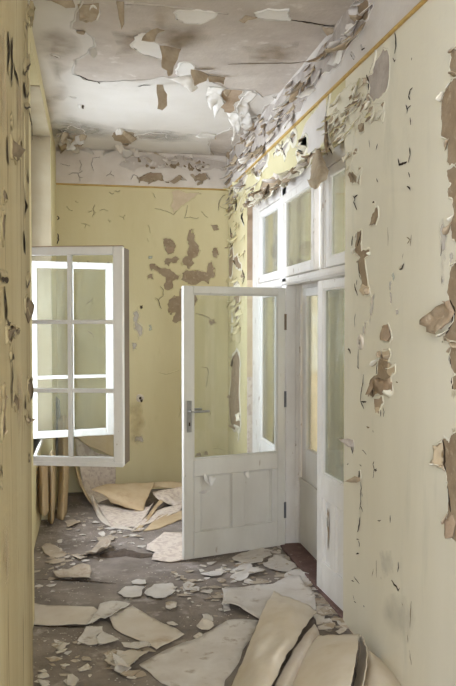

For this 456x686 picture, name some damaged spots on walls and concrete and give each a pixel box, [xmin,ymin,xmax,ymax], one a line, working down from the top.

spalling [56,0,390,324]
peeling [435,47,456,244]
peeling [25,298,34,323]
peeling [226,296,244,441]
peeling [365,324,396,417]
peeling [419,258,456,391]
peeling [428,431,456,542]